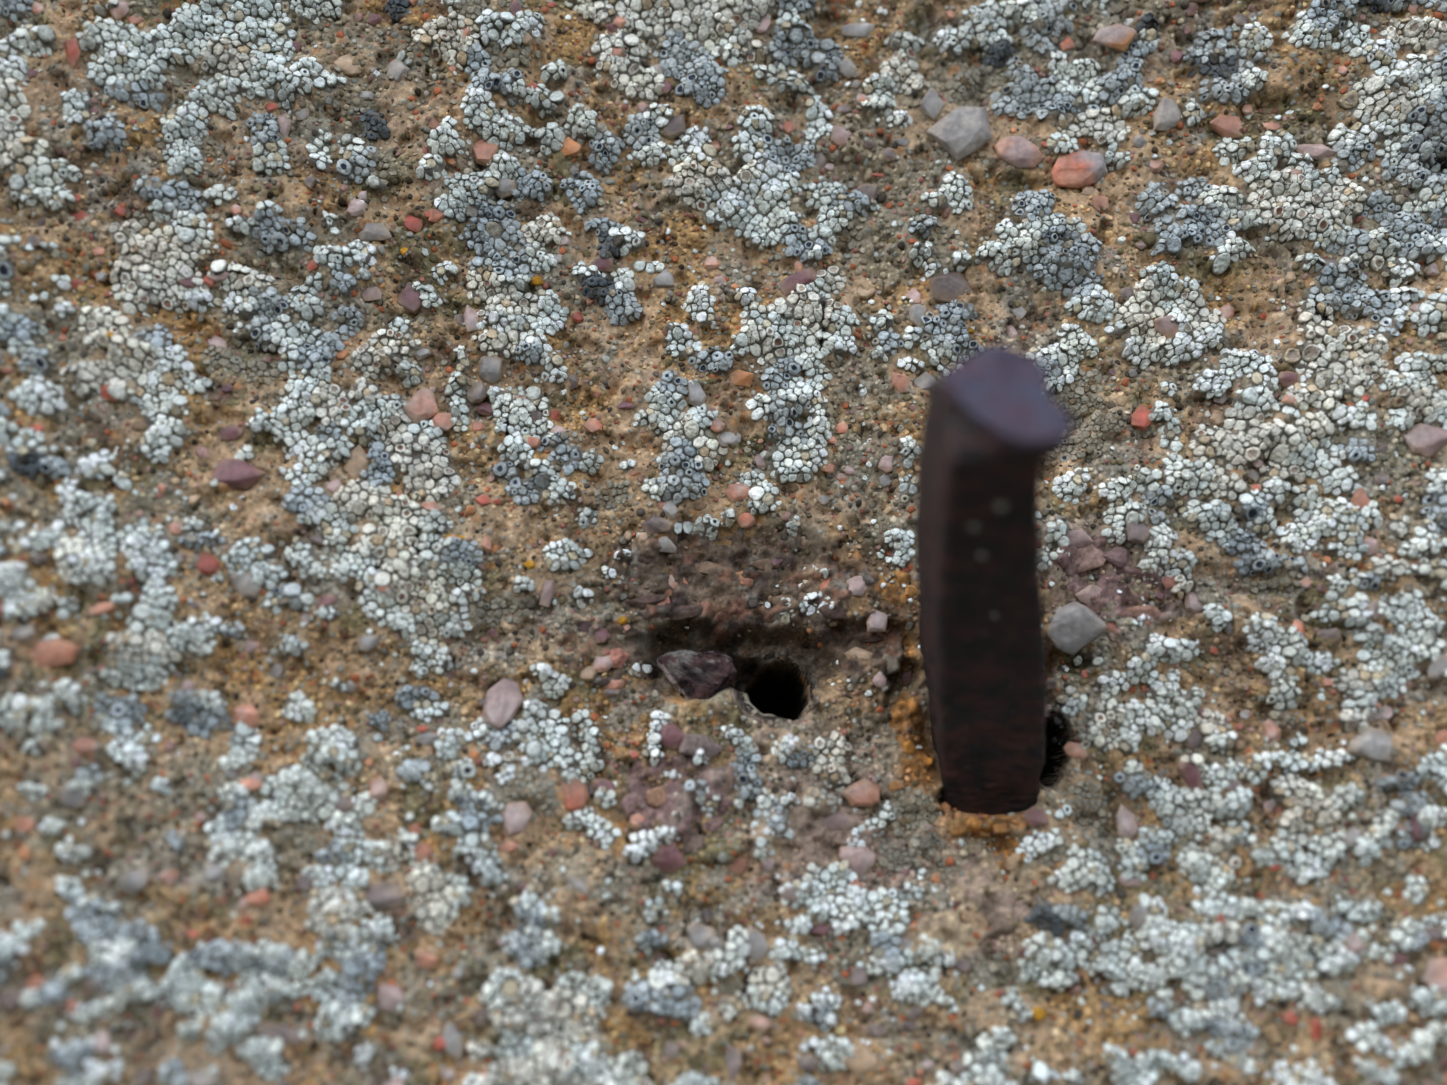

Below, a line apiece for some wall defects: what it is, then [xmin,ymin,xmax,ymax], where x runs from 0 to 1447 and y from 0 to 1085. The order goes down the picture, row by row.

spalling [562,523,905,689]